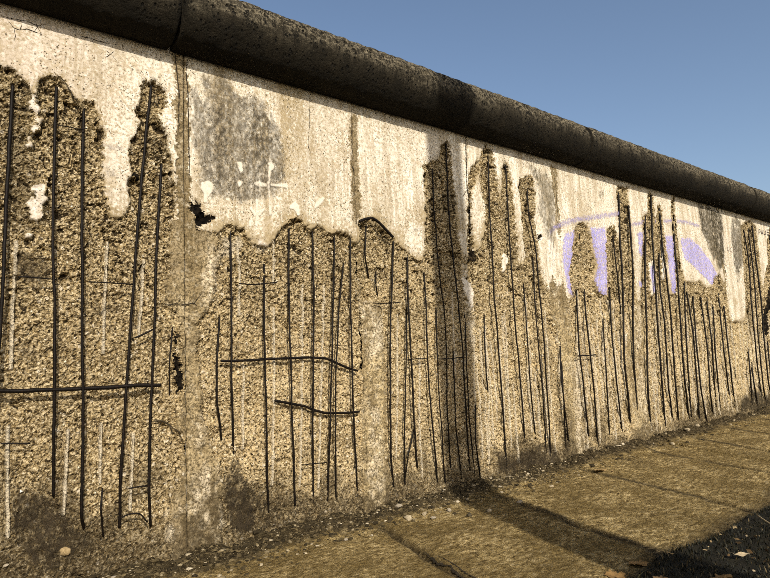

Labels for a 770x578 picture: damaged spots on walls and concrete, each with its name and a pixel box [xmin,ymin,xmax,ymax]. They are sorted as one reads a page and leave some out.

spalling [0,53,395,578]
damp [193,80,283,199]
spalling [356,140,770,513]